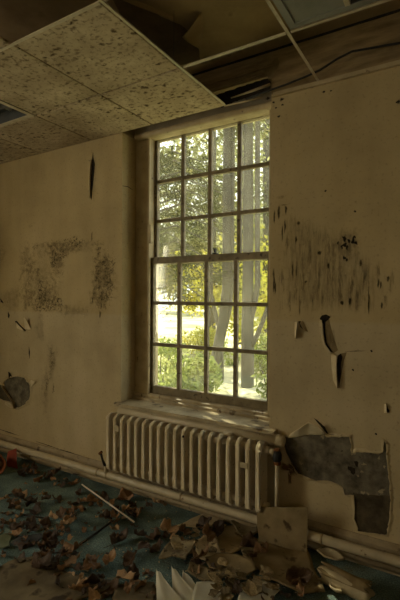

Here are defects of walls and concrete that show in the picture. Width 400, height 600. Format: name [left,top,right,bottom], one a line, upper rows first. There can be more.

hole [210,58,280,108]
crack [87,156,95,200]
peeling [319,314,352,387]
flaking render [0,372,36,410]
flaking render [282,418,395,537]